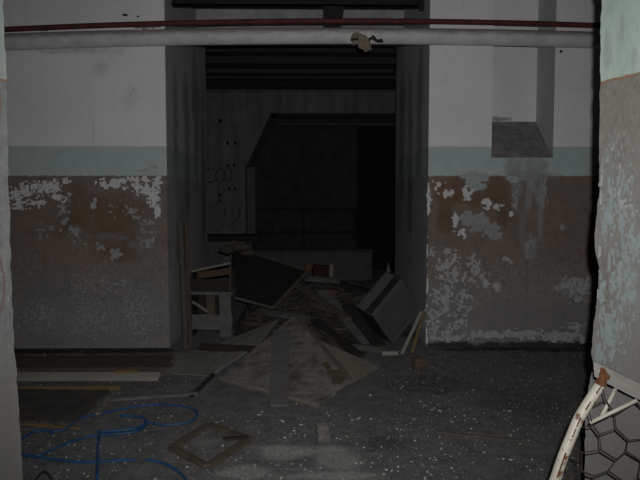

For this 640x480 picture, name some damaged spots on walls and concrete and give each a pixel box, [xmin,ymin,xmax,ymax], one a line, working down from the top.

peeling [9,177,123,261]
peeling [95,165,163,249]
peeling [424,128,640,373]